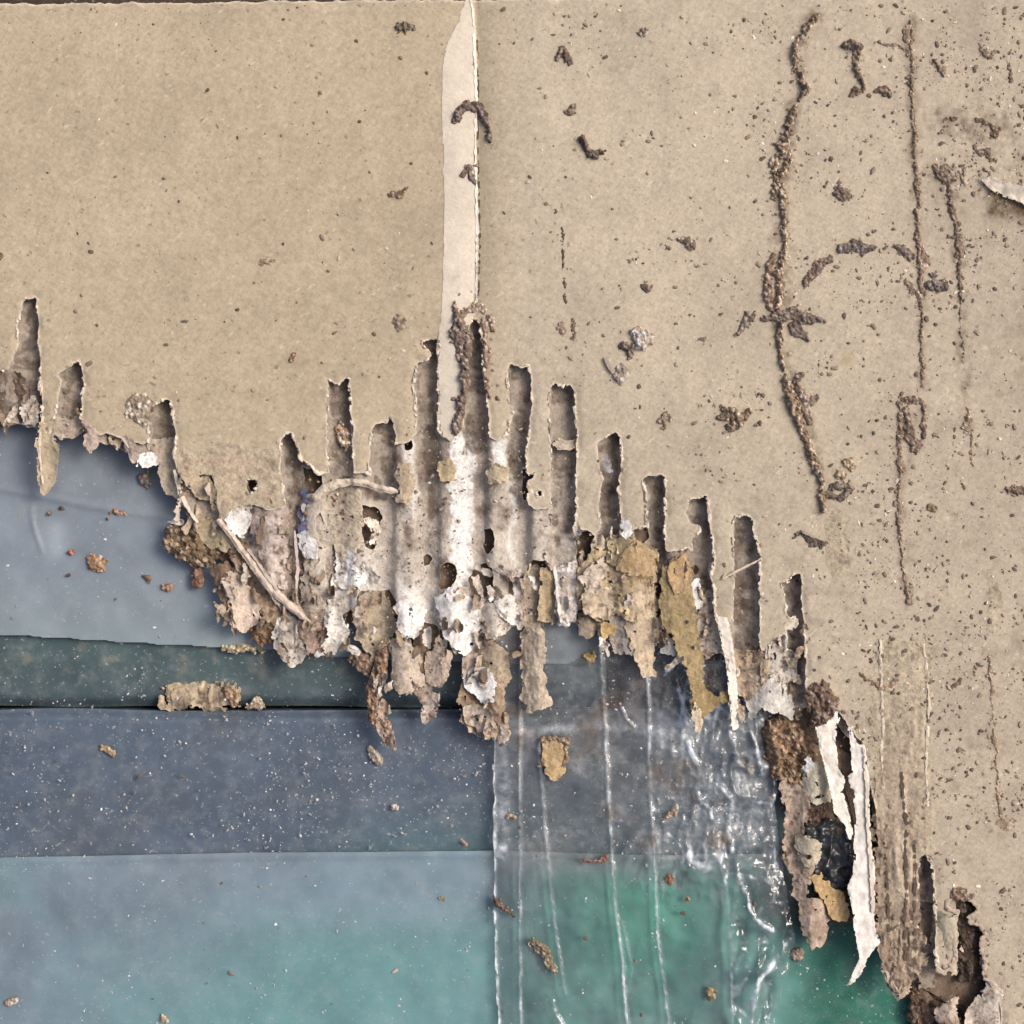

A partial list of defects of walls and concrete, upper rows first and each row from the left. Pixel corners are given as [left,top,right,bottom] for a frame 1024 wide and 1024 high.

peeling [555,317,579,341]
spalling [0,369,1004,1024]